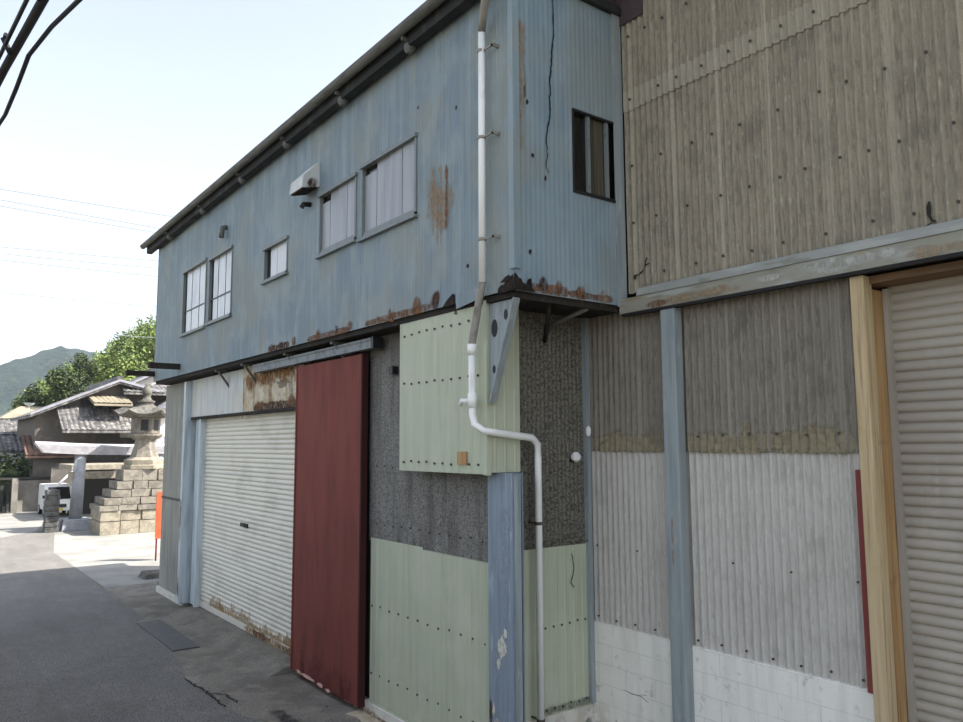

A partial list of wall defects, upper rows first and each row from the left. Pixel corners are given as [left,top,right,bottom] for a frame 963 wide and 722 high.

crack [546,0,554,172]
corrosion [429,166,452,240]
corrosion [532,277,612,302]
corrosion [243,367,296,411]
peeling [497,629,507,670]